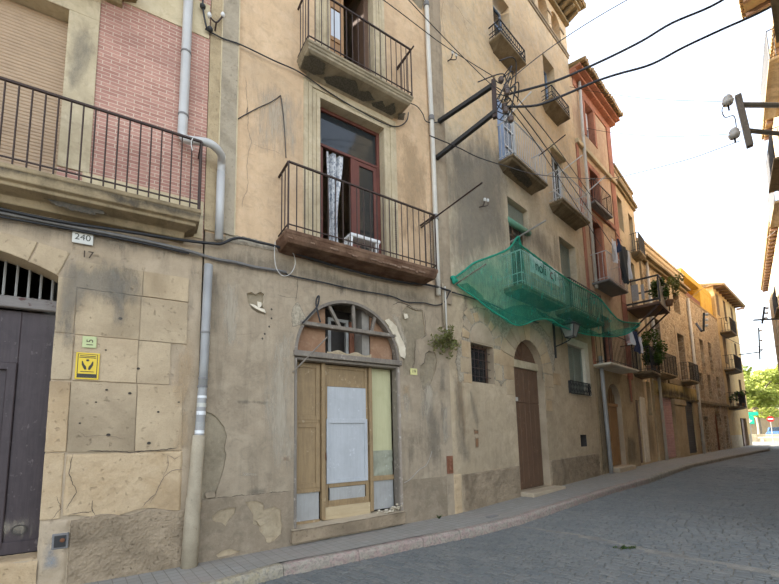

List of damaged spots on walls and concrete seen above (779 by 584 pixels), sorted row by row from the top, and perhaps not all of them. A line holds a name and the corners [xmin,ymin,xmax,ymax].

peeling [301,56,406,120]
spalling [247,292,266,315]
spalling [394,306,437,390]
crack [53,456,95,518]
crack [143,454,181,506]
spalling [245,501,282,543]